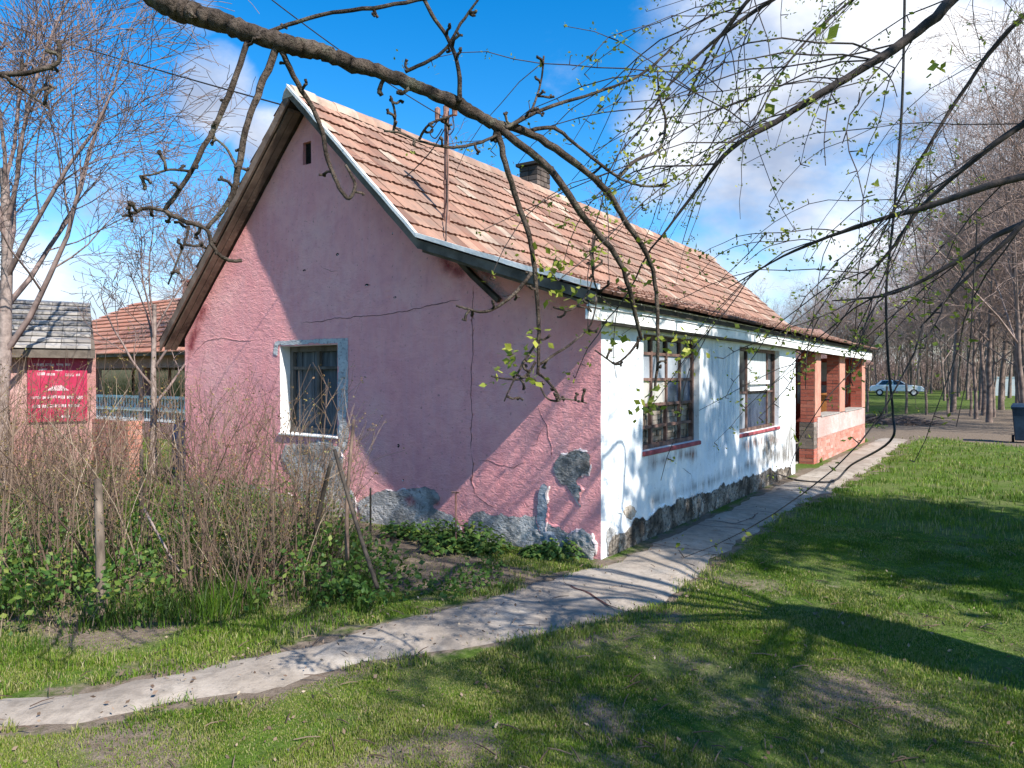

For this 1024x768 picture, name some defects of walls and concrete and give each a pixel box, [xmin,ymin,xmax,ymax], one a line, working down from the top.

flaking render [183,418,592,554]
crack [302,285,553,510]